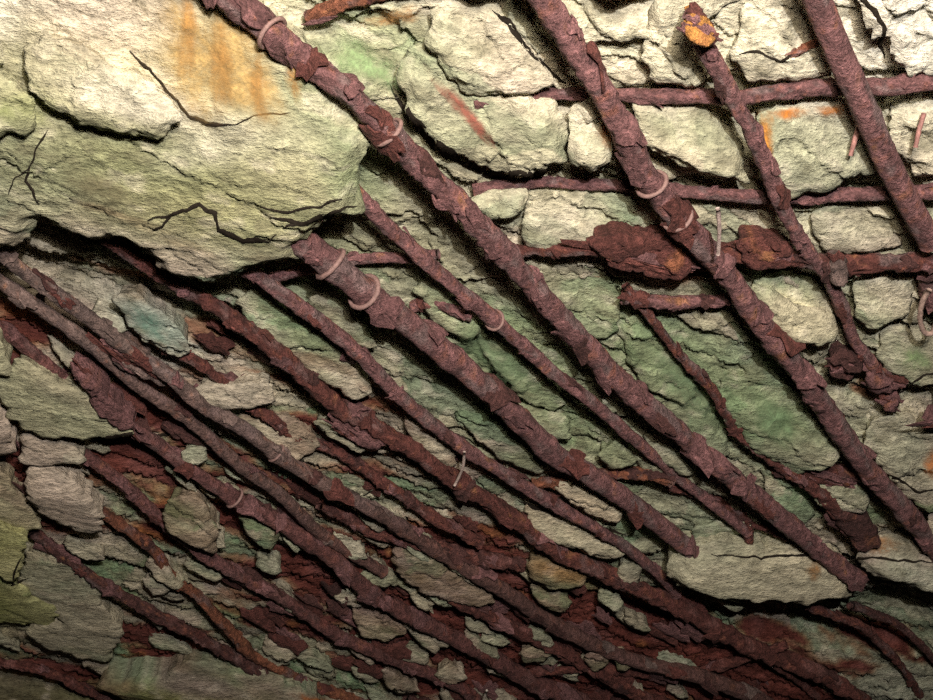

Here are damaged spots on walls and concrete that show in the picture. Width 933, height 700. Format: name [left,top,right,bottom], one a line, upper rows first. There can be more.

crack [8,130,48,204]
crack [130,51,291,127]
corrosion [174,3,272,106]
crack [148,199,357,244]
corrosion [202,0,933,592]
peeling [396,0,841,477]
peeling [757,96,903,254]
peeling [0,327,336,700]
corrosion [0,236,872,700]
peeling [454,410,651,633]
peeling [666,517,852,612]
corrosion [801,601,933,700]